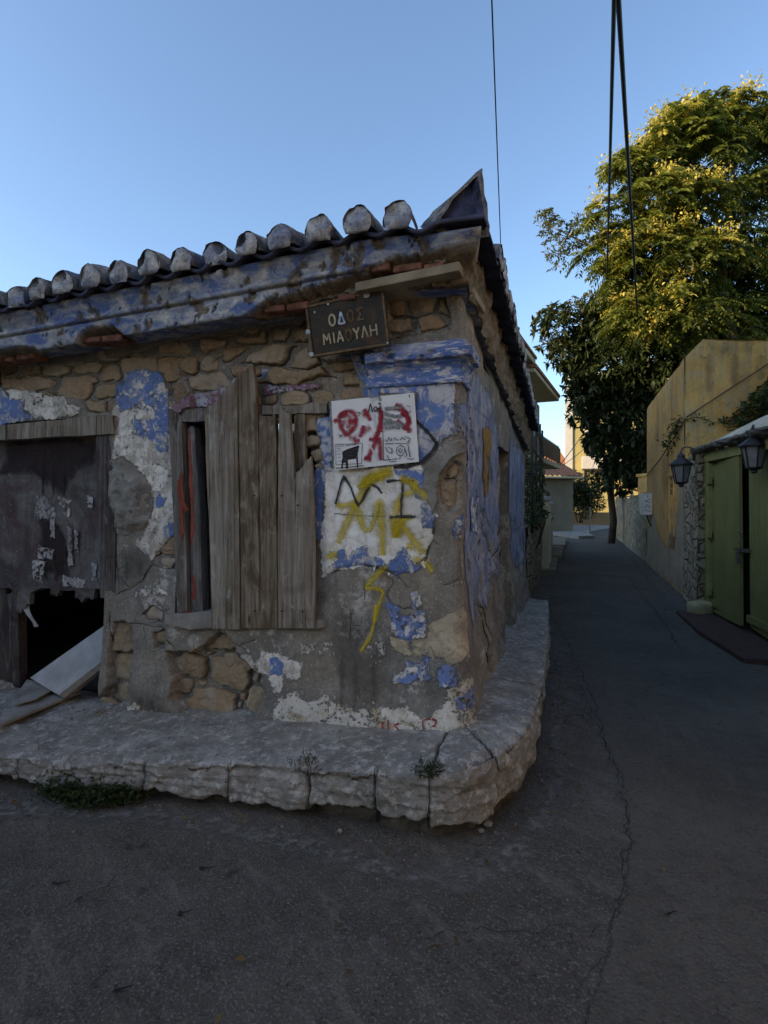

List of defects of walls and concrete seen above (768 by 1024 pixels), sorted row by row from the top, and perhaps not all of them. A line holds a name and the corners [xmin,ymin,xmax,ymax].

peeling [0,320,526,712]
crack [389,660,654,1020]